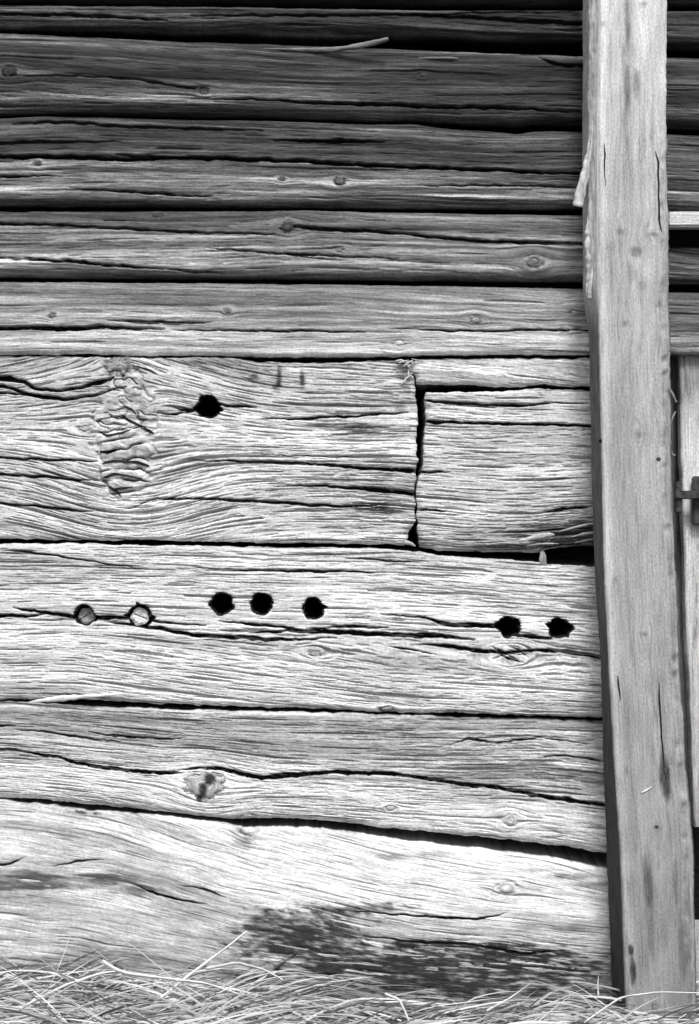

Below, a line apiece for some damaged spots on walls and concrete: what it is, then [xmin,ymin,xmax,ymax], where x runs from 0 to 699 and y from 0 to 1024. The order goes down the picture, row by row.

crack [654,151,662,232]
crack [0,376,591,513]
crack [0,608,599,662]
crack [0,725,605,806]
crack [657,686,665,764]